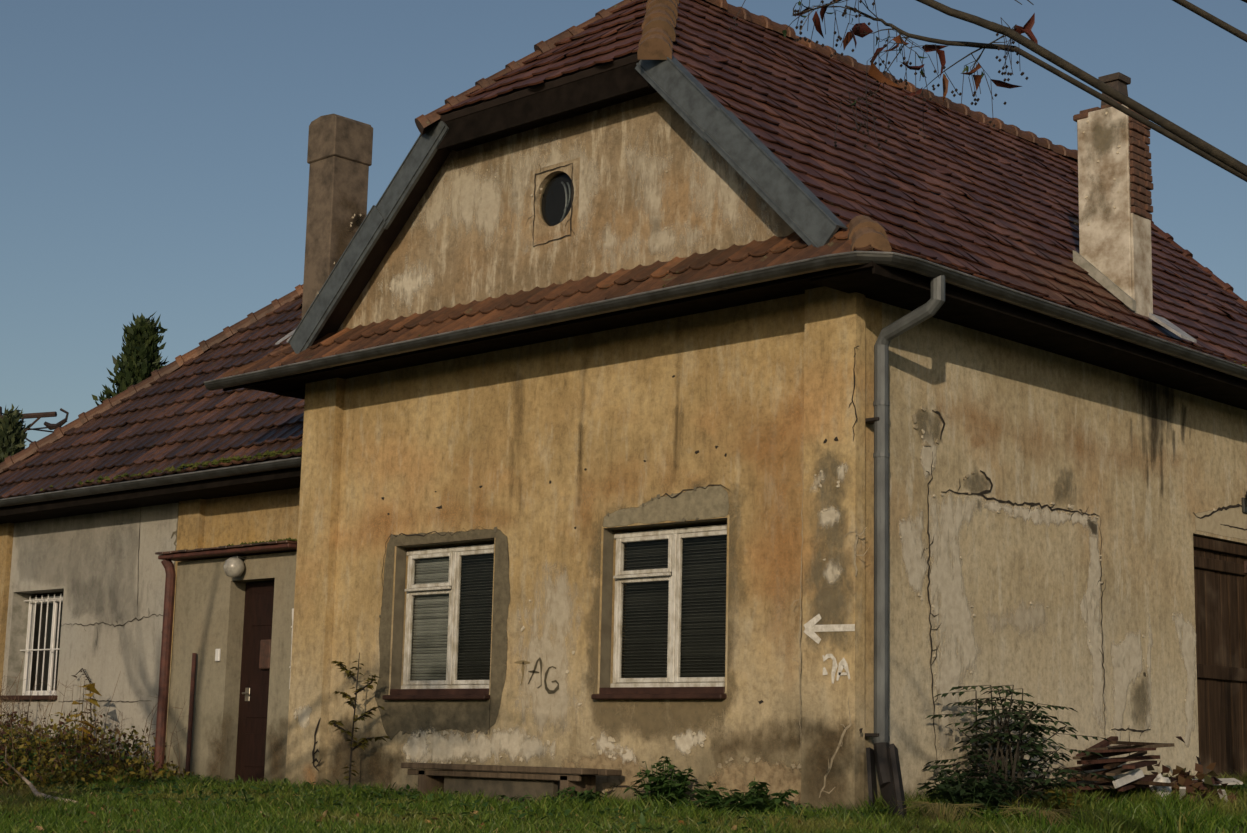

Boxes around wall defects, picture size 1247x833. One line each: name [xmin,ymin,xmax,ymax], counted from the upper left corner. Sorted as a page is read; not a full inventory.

water stain [1138,380,1186,457]
peeling [814,464,846,489]
peeling [820,507,840,526]
peeling [823,559,840,583]
crack [60,596,162,646]
peeling [899,470,1145,750]
peeling [402,564,646,795]
peeling [672,731,706,754]